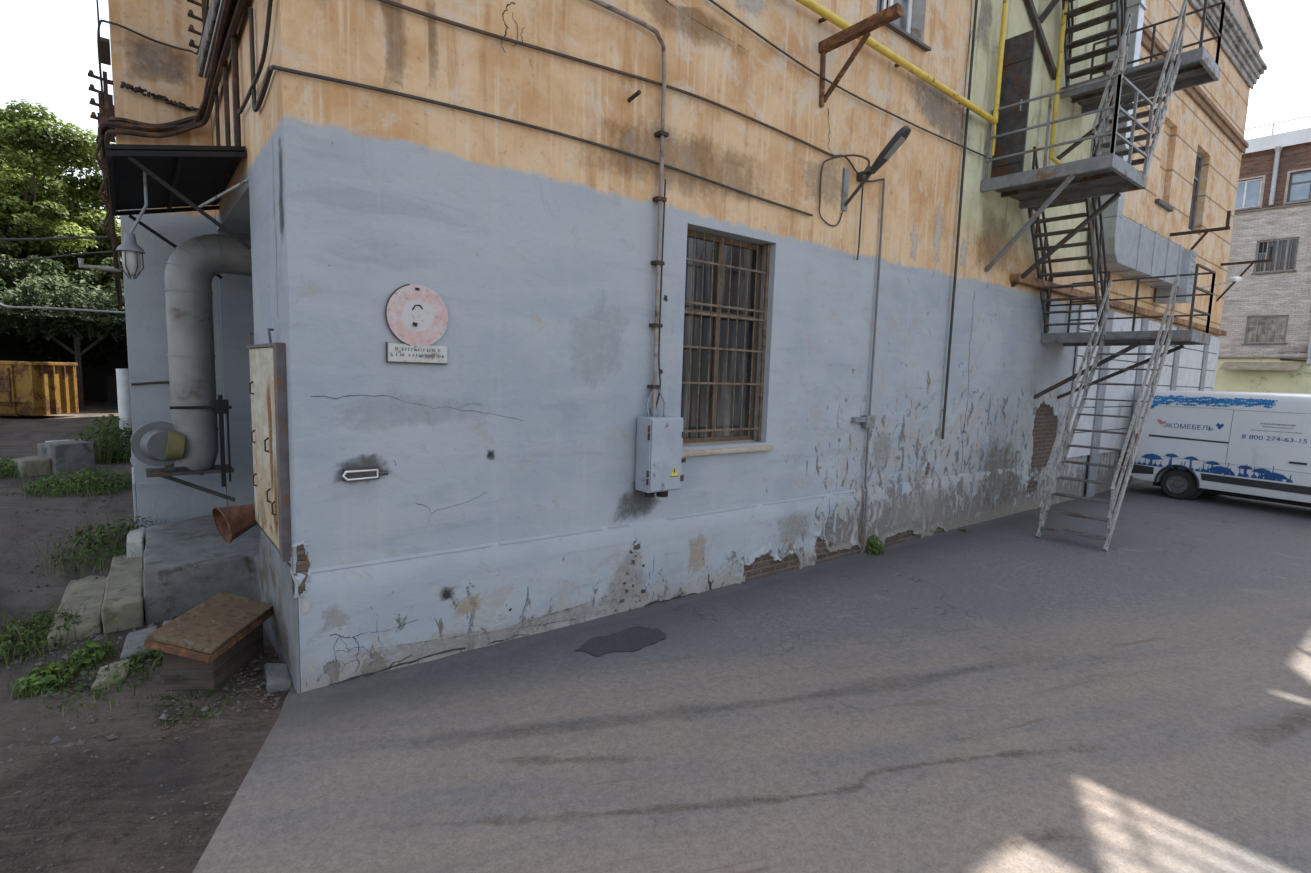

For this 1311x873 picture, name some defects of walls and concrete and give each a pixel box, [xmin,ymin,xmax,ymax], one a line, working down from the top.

crack [311,395,522,427]
corrosion [258,389,277,527]
flaking render [1023,396,1059,500]
spalling [290,540,314,613]
flaking render [735,530,863,584]
crack [328,620,529,686]